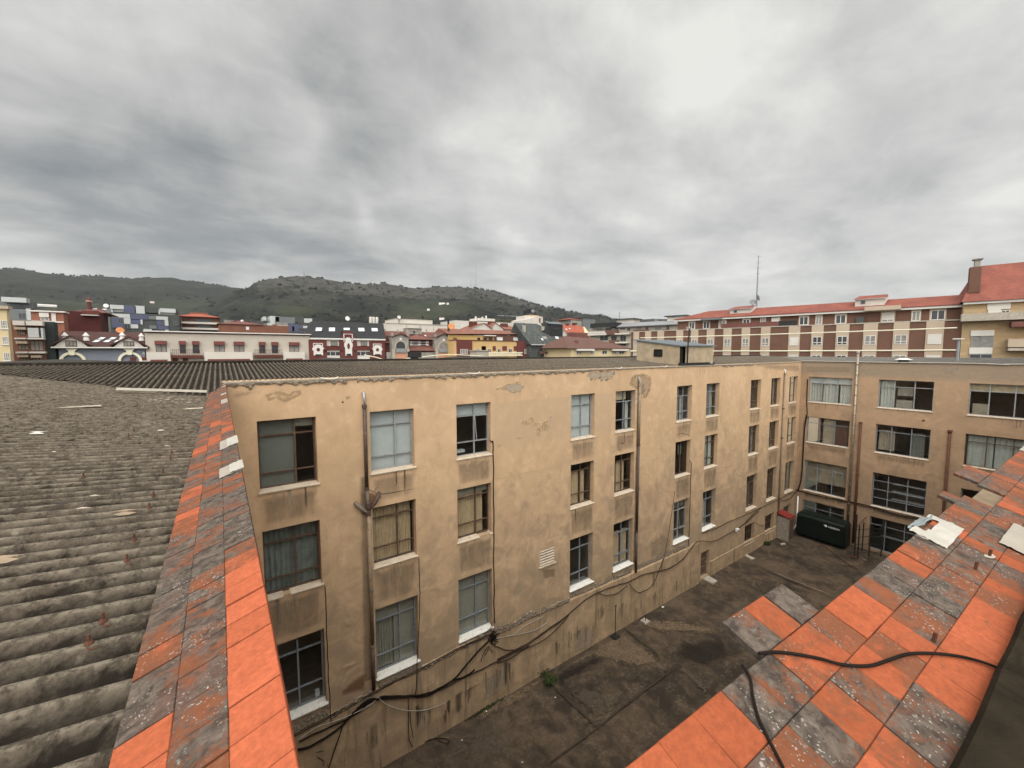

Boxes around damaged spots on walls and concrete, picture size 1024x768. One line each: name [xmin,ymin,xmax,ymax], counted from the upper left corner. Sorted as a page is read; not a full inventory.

spalling [226,370,615,393]